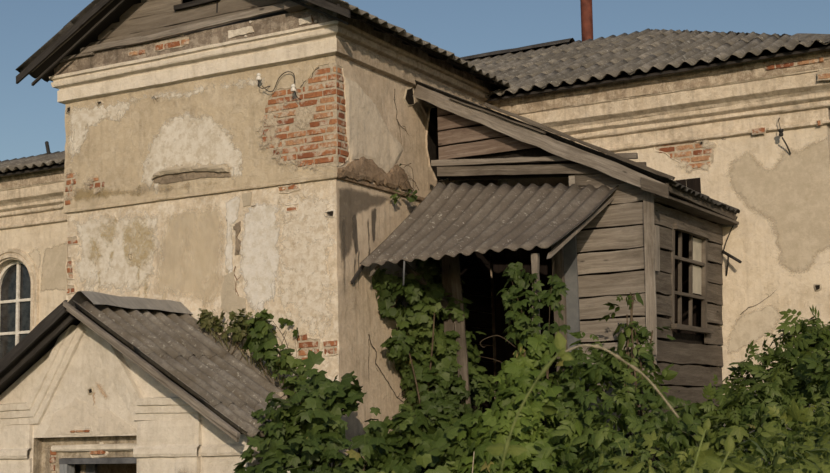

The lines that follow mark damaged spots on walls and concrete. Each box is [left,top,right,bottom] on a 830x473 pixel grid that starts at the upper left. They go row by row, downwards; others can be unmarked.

flaking render [128,34,189,57]
flaking render [763,55,830,81]
flaking render [60,169,106,208]
peeling [66,77,264,158]
flaking render [255,62,413,192]
flaking render [653,140,716,173]
peeling [41,212,160,295]
peeling [221,183,340,360]